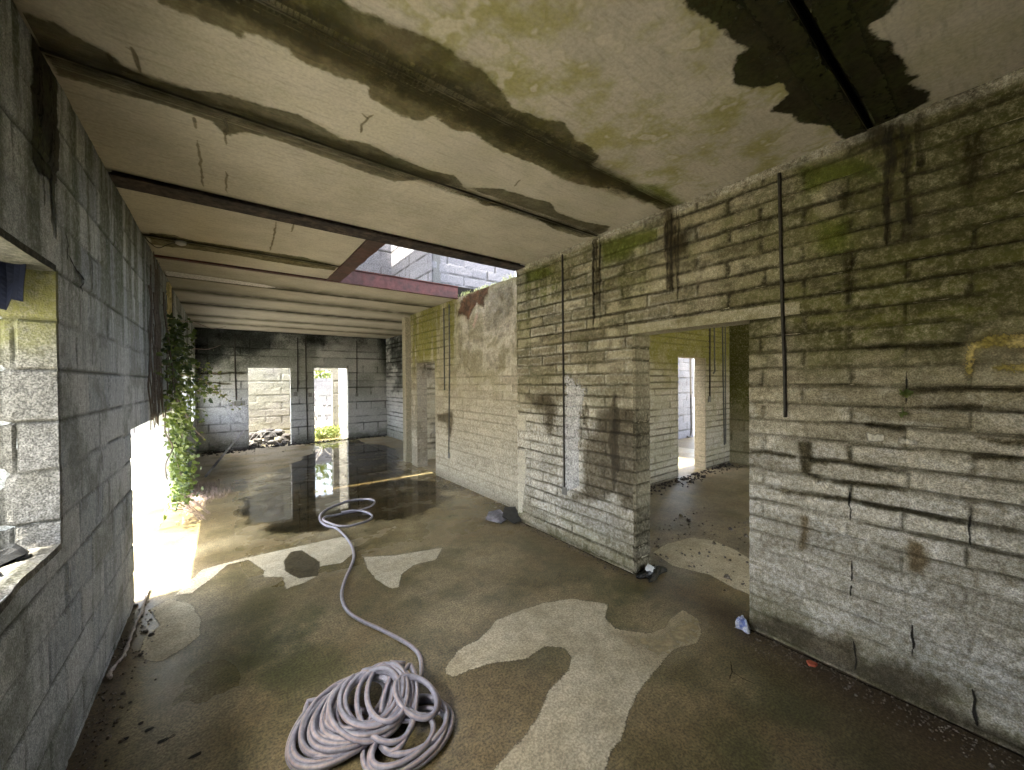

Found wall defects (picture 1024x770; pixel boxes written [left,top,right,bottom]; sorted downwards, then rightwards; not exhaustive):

water stain [30,34,214,239]
water stain [197,0,688,304]
water stain [685,0,930,248]
water stain [562,375,585,491]
crack [750,625,1024,758]